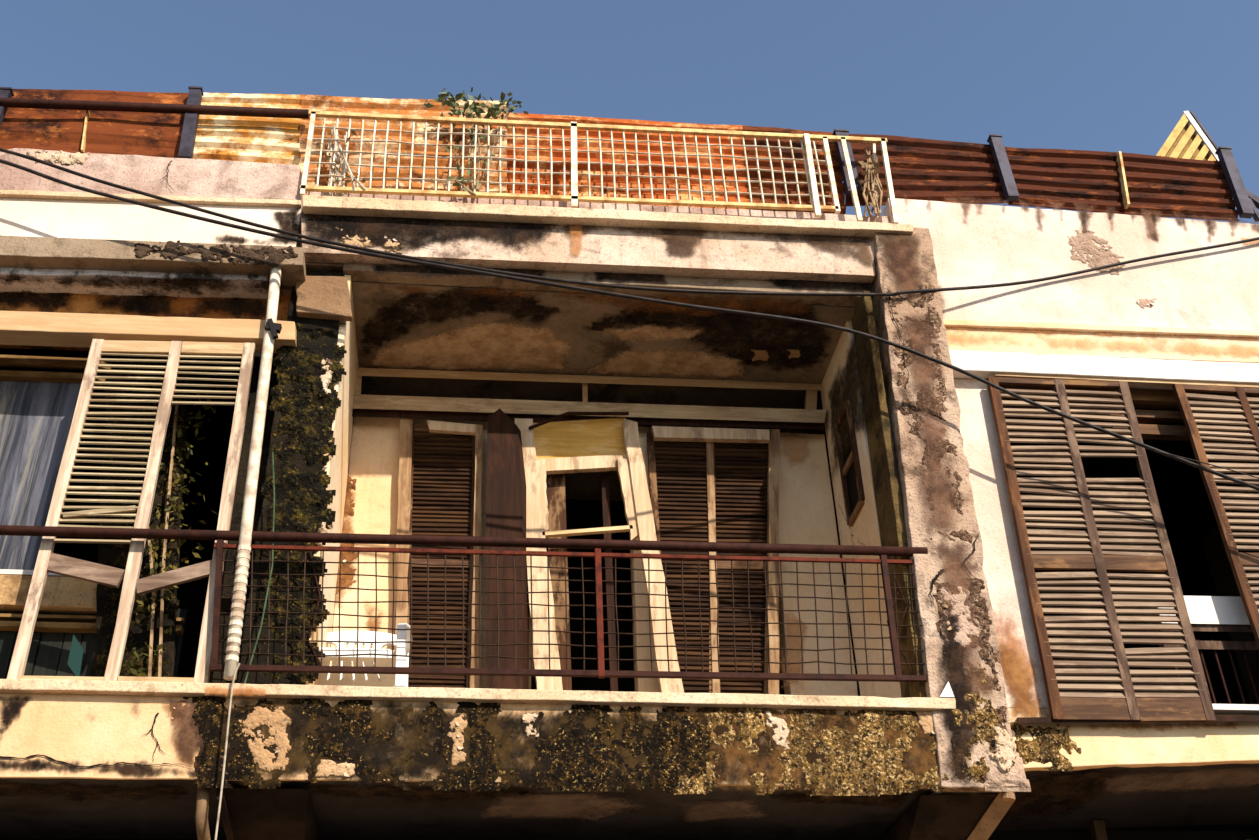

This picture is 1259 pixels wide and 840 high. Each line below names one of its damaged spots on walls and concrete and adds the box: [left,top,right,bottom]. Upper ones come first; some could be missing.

leakage [0,277,295,316]
peeling [134,240,299,267]
leakage [219,208,873,371]
leakage [732,231,922,297]
leakage [1131,210,1160,241]
spalling [882,284,973,544]
leakage [0,546,1044,821]
spalling [932,578,1017,784]
crack [0,713,194,771]
peeling [447,714,467,766]
peeling [522,713,539,737]
peeling [766,711,790,750]